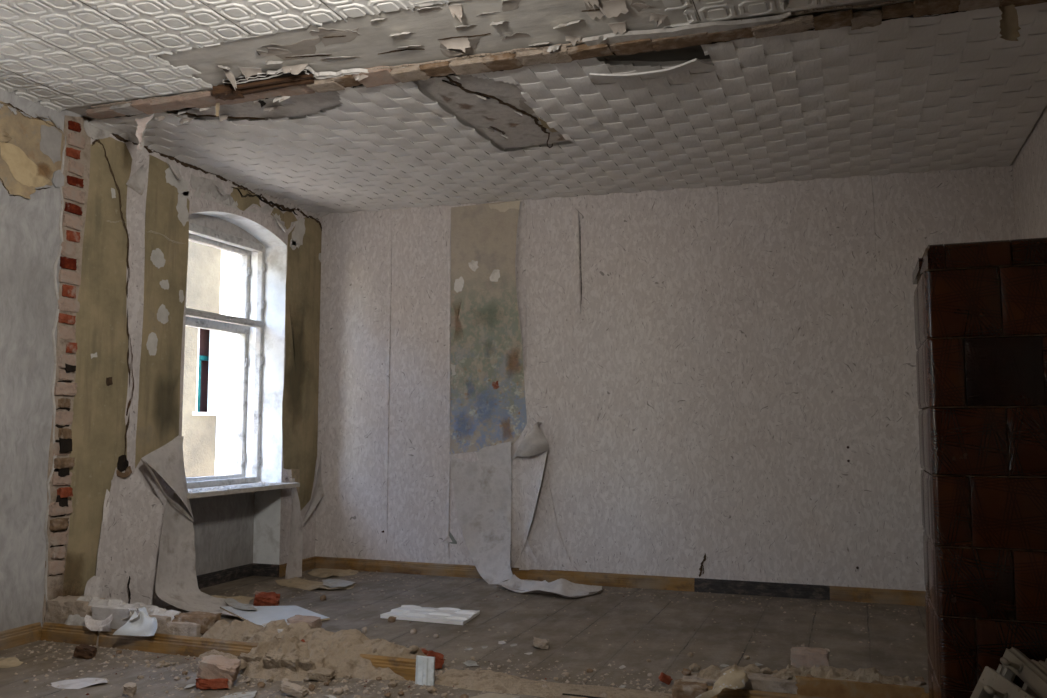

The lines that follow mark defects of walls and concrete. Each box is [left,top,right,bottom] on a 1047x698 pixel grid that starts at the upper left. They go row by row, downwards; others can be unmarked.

flaking render [85,0,1047,149]
flaking render [144,146,320,233]
flaking render [454,260,479,293]
flaking render [42,115,222,637]